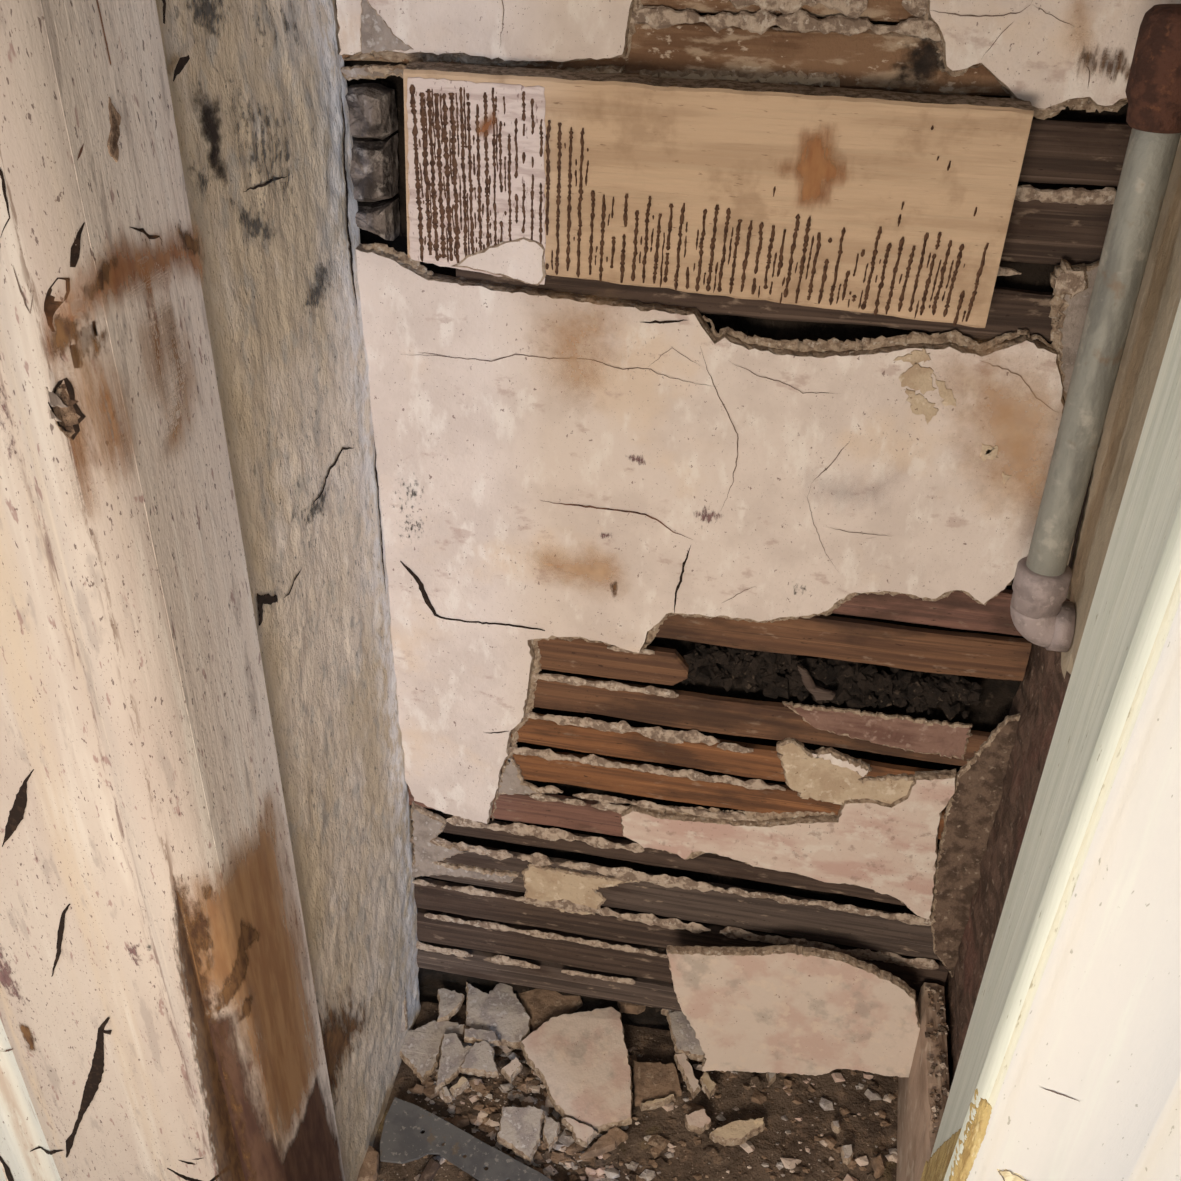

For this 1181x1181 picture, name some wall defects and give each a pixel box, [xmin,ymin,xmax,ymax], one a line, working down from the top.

spalling [341,0,982,81]
crack [931,0,1071,58]
rust [99,381,128,459]
rust [49,225,203,356]
rust [150,317,187,440]
crack [418,320,833,510]
spalling [702,259,1100,425]
crack [311,434,545,631]
crack [541,500,693,615]
spalling [410,581,1021,979]
leakage [173,805,366,1181]
peeling [921,1089,992,1181]